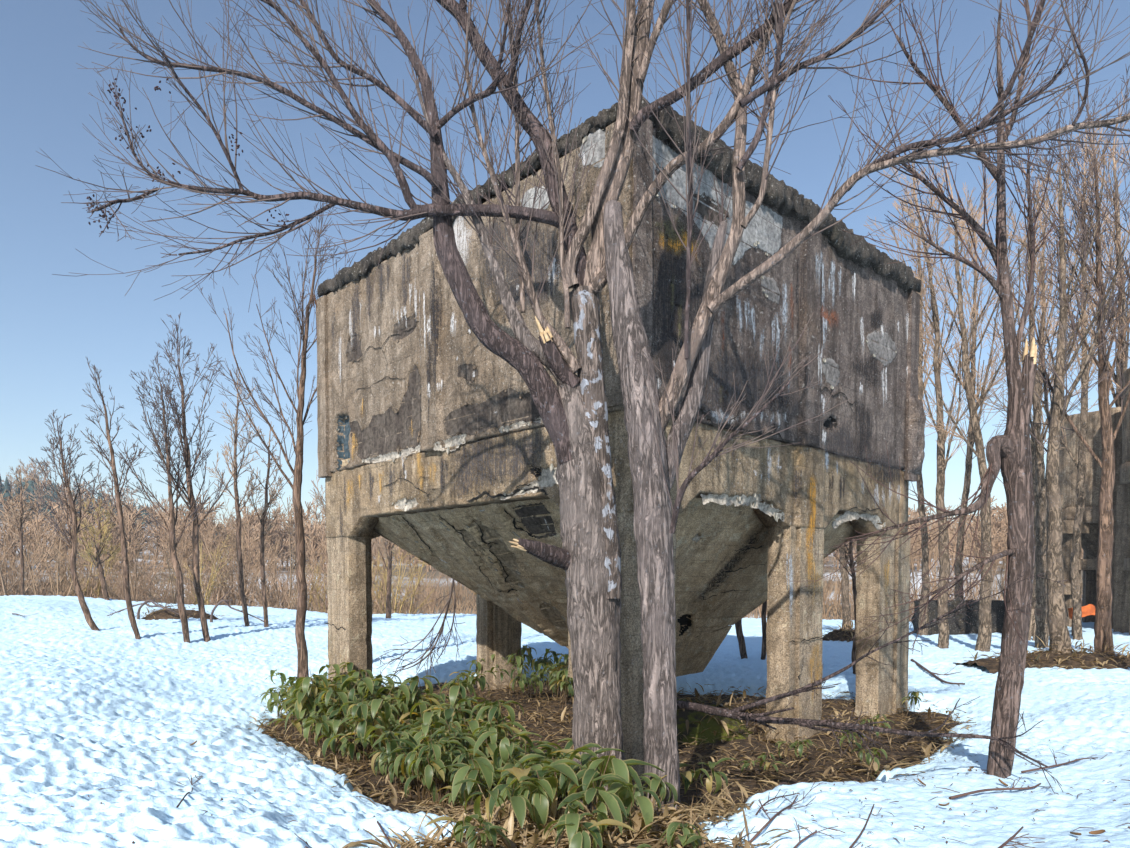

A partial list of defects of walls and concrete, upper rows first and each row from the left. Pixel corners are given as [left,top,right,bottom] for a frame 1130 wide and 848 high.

peeling [653,136,783,265]
damp [853,311,887,403]
damp [369,460,406,502]
crack [383,476,548,593]
peeling [459,517,525,591]
damp [440,427,546,494]
peeling [500,463,558,539]
spalling [701,492,785,522]
spalling [832,511,885,530]
damp [822,403,902,502]